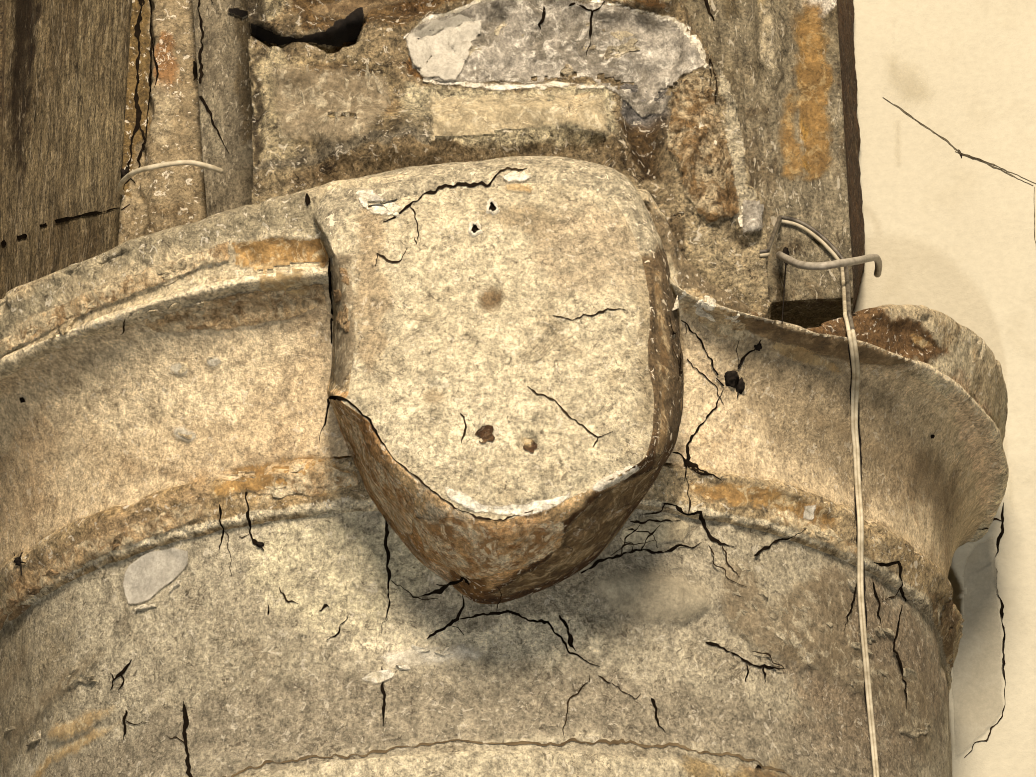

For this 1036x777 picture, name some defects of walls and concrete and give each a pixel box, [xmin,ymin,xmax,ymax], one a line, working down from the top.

crack [193,0,229,153]
rust [779,5,832,180]
crack [375,167,527,266]
peeling [445,486,569,516]
spalling [495,271,752,596]
crack [580,316,805,587]
crack [110,659,147,740]
crack [170,701,193,777]
crack [222,515,792,777]
crack [844,561,922,709]
peeling [930,540,1003,754]
crack [964,503,1006,758]